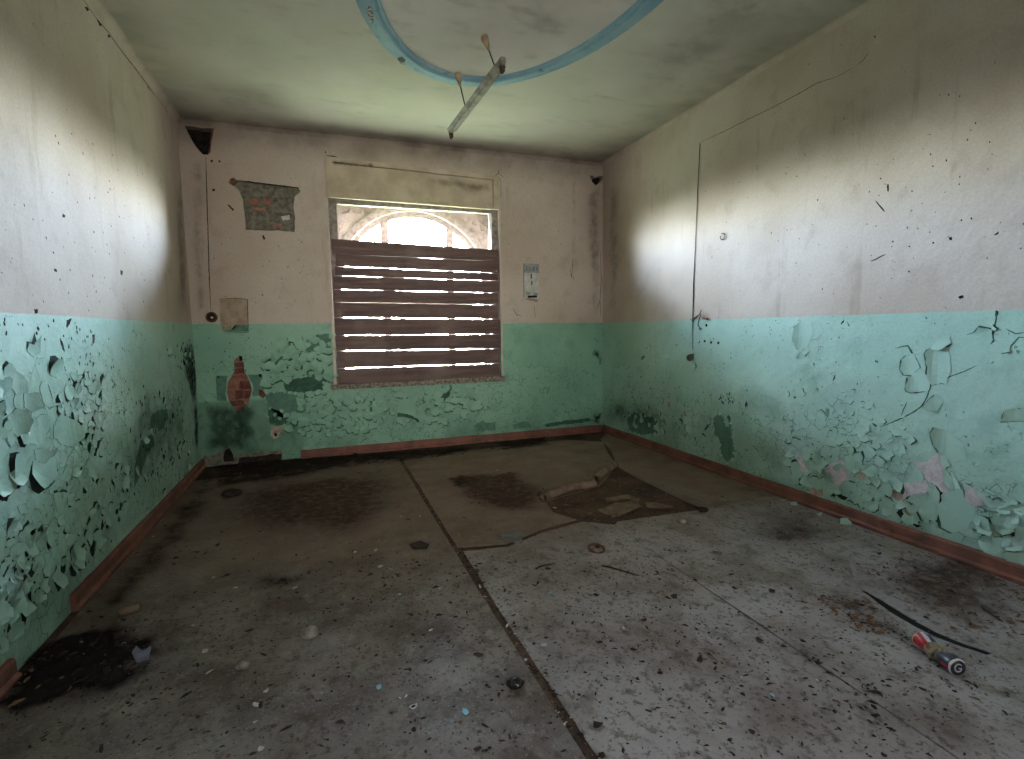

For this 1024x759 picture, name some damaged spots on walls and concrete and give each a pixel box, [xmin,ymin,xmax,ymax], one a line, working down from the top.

crack [704,52,869,141]
spalling [227,178,302,243]
peeling [167,332,496,466]
peeling [899,336,951,393]
crack [881,345,977,427]
crack [967,310,1024,347]
peeling [1000,402,1024,423]
peeling [0,318,194,655]
peeling [782,423,1024,565]
leakage [0,627,156,711]